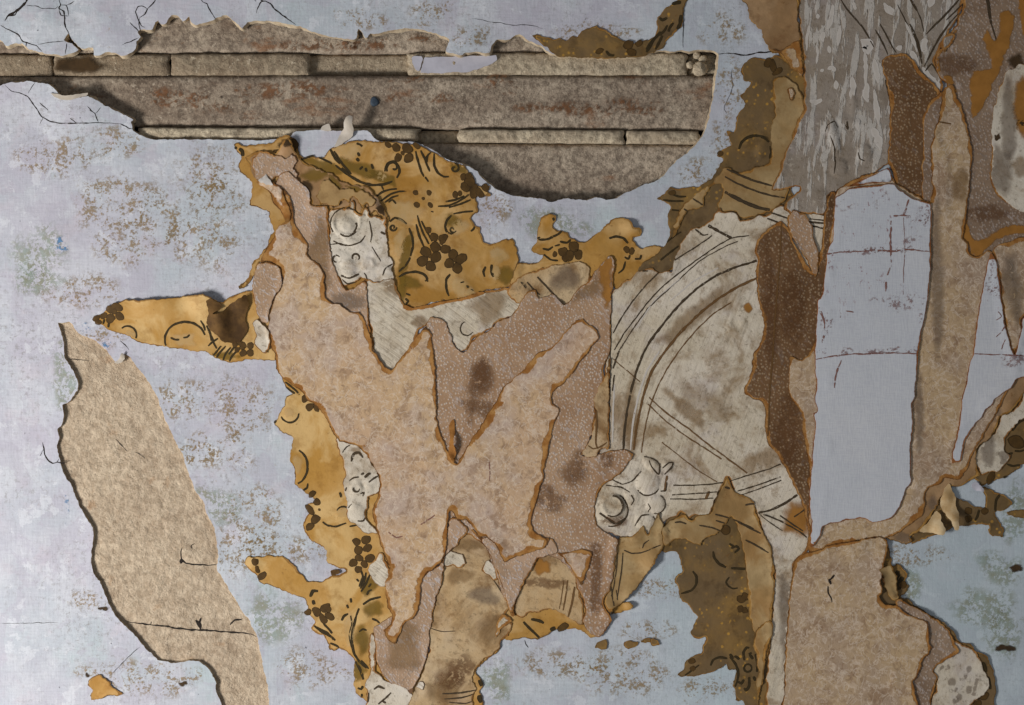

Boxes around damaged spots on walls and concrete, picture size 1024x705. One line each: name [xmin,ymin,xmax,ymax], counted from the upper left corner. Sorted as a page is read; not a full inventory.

crack [2,0,74,52]
crack [124,1,155,44]
crack [256,0,296,25]
peeling [412,56,423,71]
crack [8,84,132,129]
peeling [321,115,354,147]
flaking render [58,323,269,705]
peeling [604,513,664,614]
crack [127,618,255,636]